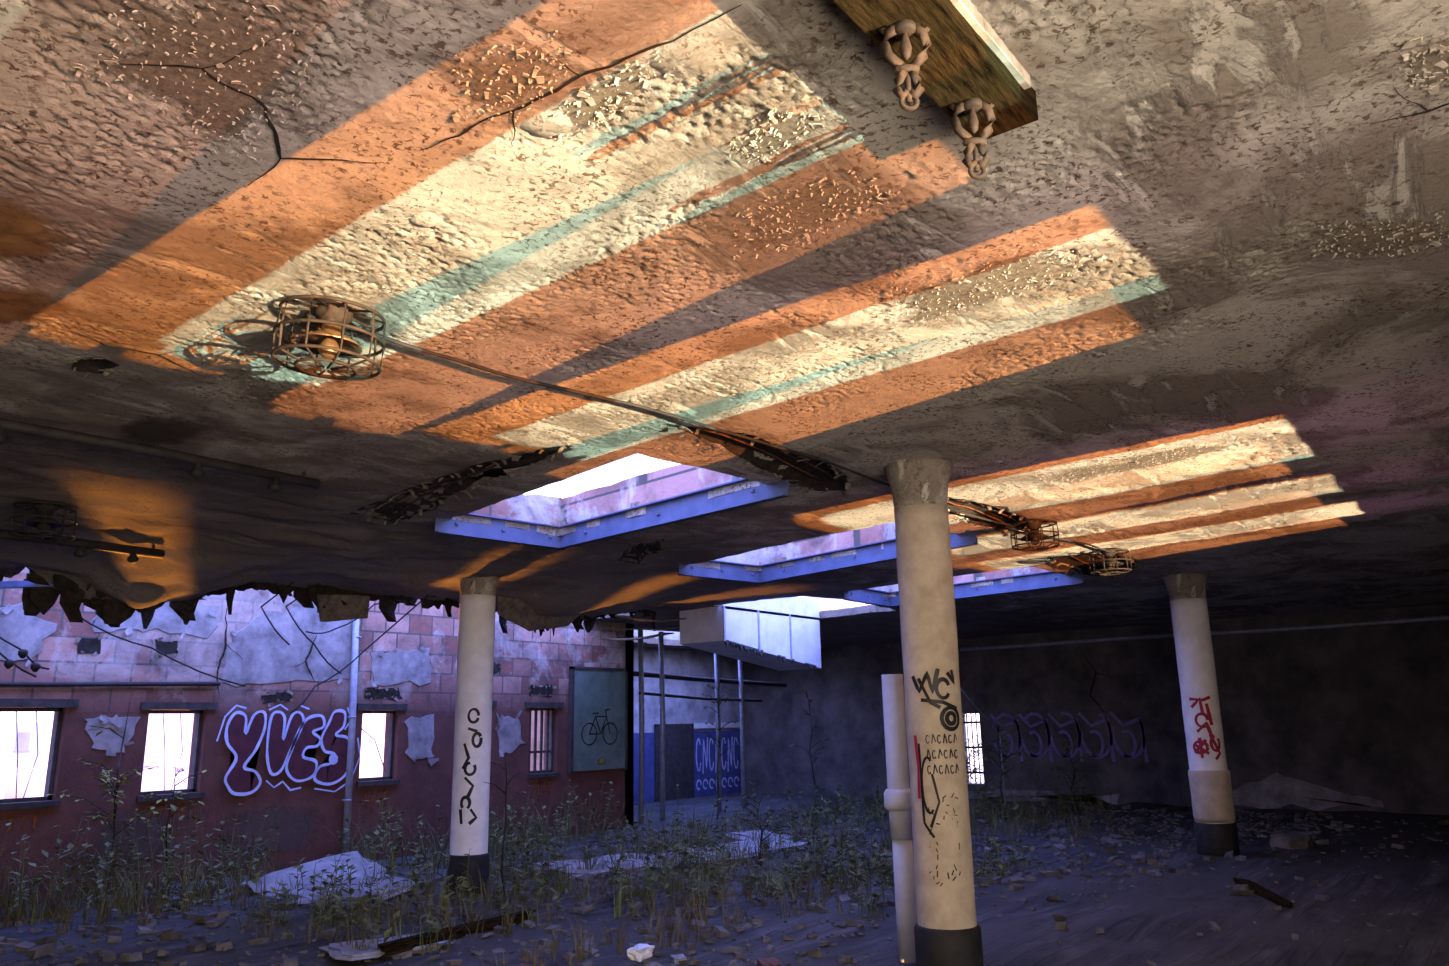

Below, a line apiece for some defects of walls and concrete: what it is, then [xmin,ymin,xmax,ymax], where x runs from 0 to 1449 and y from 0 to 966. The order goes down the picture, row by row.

crack [120,37,384,185]
crack [419,4,742,151]
peeling [0,603,57,667]
peeling [75,600,432,707]
peeling [85,714,140,756]
peeling [404,714,439,766]